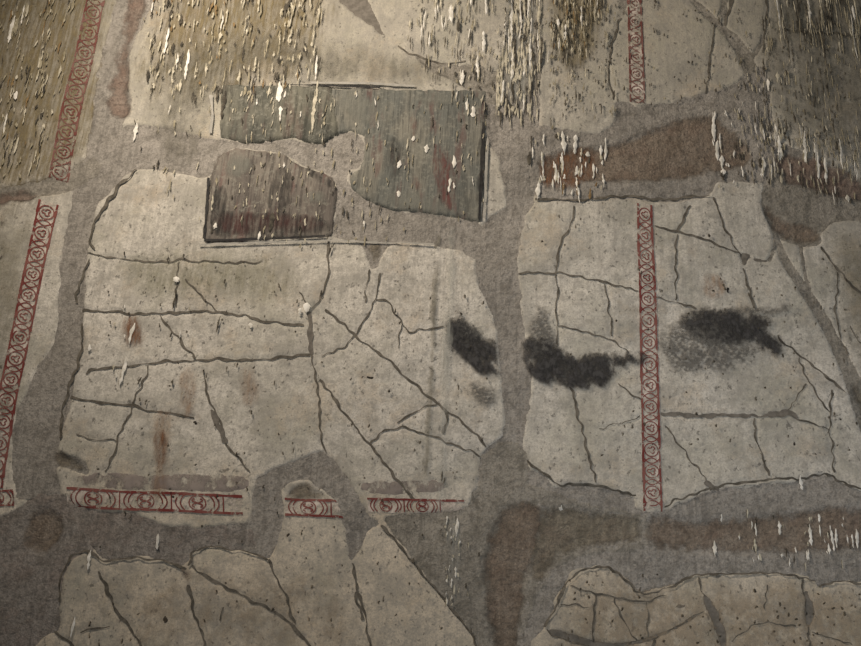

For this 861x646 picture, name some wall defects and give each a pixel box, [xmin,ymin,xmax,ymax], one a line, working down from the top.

damp [0,0,95,186]
damp [143,0,355,248]
damp [327,95,389,254]
damp [384,111,441,187]
damp [711,0,861,205]
crack [59,169,486,502]
crack [518,194,756,351]
spalling [56,453,82,468]
crack [54,546,311,646]
crack [544,565,861,646]
spalling [647,508,861,553]
crack [661,335,861,508]